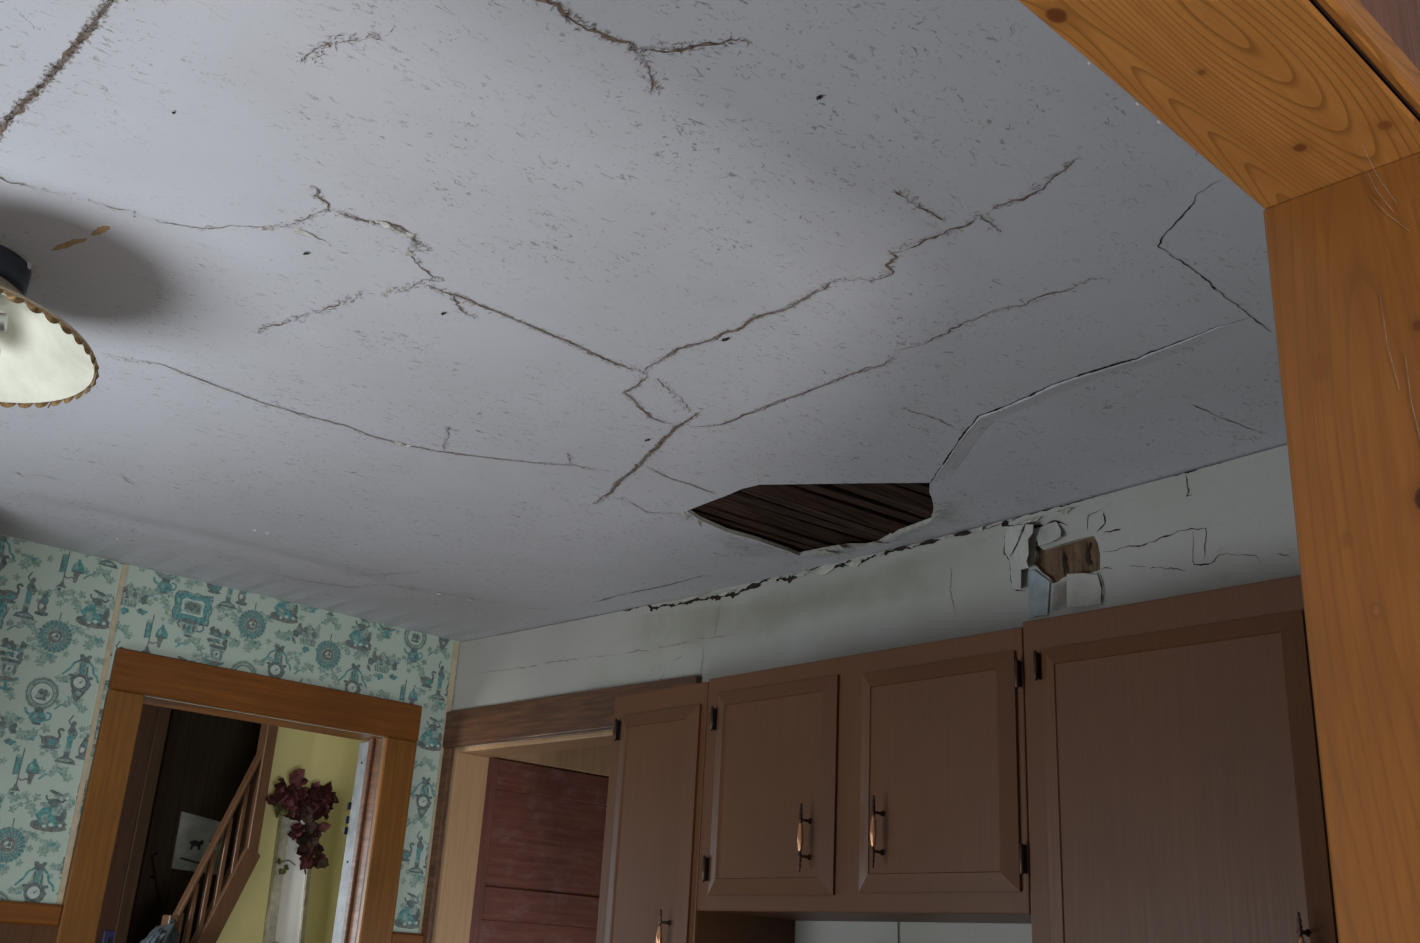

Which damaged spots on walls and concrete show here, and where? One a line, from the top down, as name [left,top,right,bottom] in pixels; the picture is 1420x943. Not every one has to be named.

crack [0,0,128,143]
crack [297,29,393,64]
crack [521,0,748,95]
crack [0,158,1110,515]
flaking render [1003,522,1103,619]